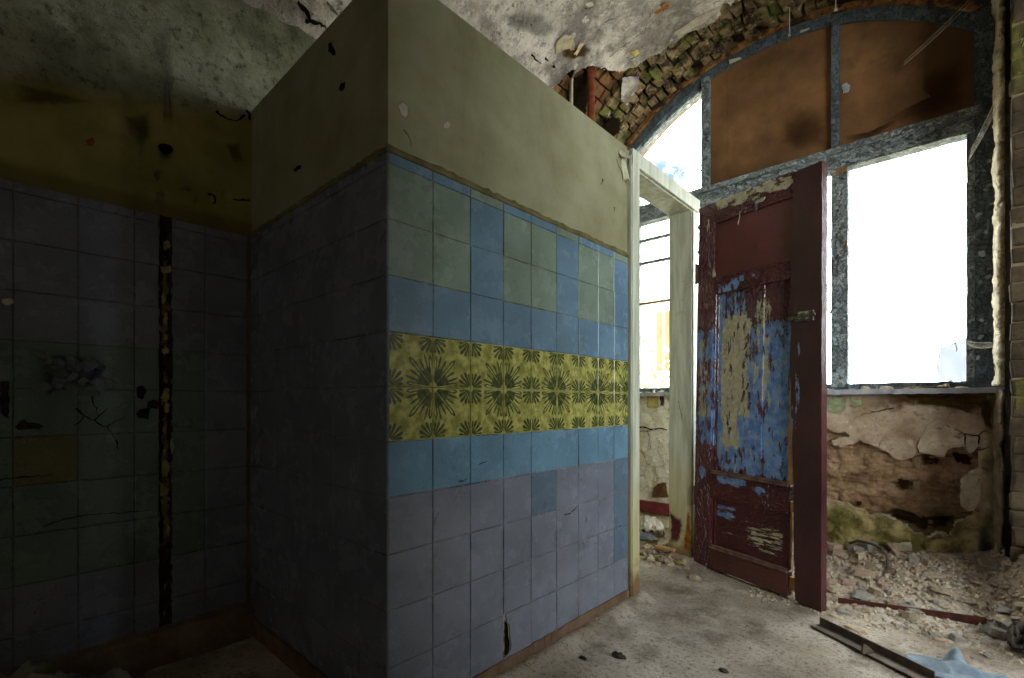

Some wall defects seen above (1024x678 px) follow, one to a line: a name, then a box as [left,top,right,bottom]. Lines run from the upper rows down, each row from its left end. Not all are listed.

flaking render [553,34,639,137]
flaking render [827,0,1005,554]
crack [73,397,125,449]
flaking render [650,482,669,498]